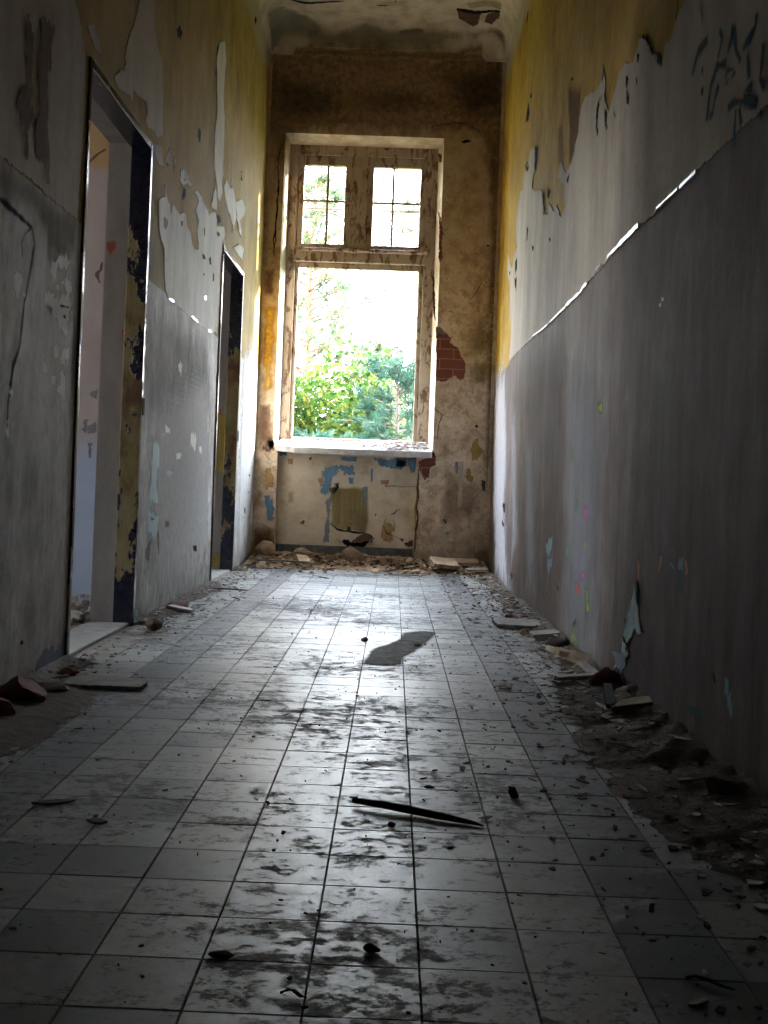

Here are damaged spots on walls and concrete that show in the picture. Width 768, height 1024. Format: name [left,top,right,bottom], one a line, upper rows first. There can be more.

peeling [0,0,102,219]
peeling [114,0,246,333]
flaking render [457,1,502,27]
peeling [507,0,768,362]
crack [0,198,35,427]
water stain [269,9,507,587]
flaking render [432,277,466,382]
peeling [318,452,438,547]
peeling [460,562,715,799]